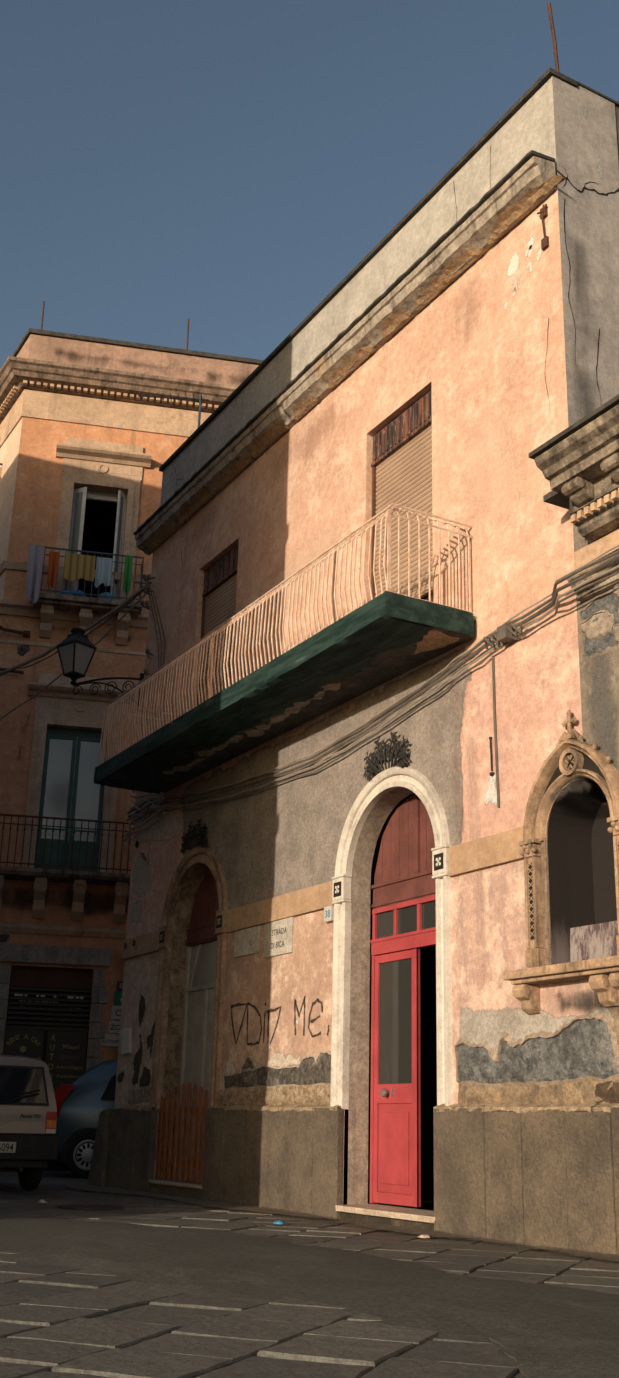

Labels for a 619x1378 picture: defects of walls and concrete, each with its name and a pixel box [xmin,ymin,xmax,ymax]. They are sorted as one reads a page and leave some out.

crack [545,166,619,405]
flaking render [579,583,619,662]
flaking render [218,1031,331,1106]
flaking render [454,1007,619,1106]